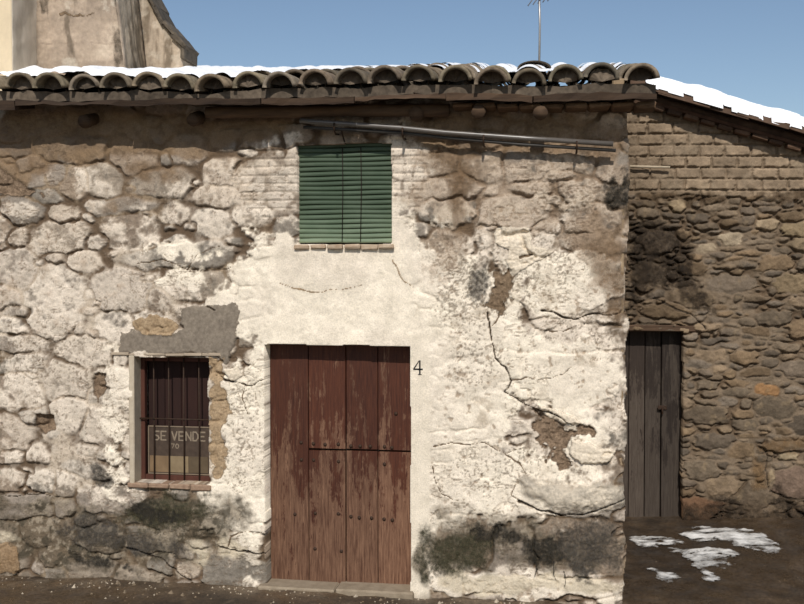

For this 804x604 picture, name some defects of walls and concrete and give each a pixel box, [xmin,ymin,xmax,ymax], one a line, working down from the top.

spalling [0,168,45,198]
spalling [467,264,515,316]
flaking render [132,314,178,336]
crack [487,301,570,408]
flaking render [209,356,242,479]
spalling [531,405,616,471]
crack [433,442,625,515]
leakage [415,528,430,582]
leakage [470,521,589,587]